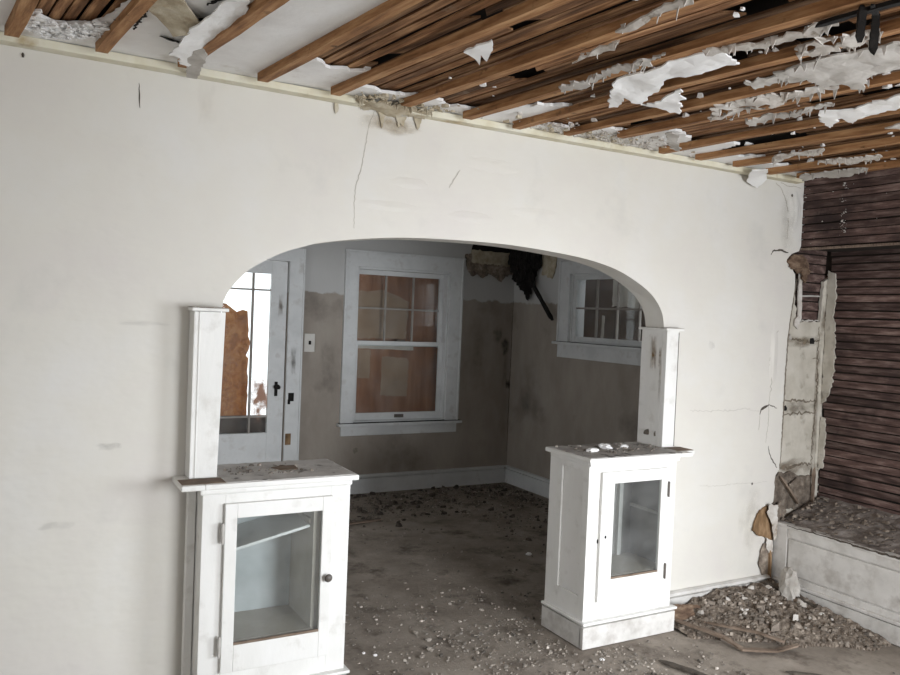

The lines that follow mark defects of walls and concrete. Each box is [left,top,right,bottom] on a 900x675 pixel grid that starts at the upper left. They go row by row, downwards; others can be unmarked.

spalling [24,9,110,42]
flaking render [149,0,250,79]
flaking render [464,39,493,65]
flaking render [572,0,694,64]
flaking render [558,22,900,128]
spalling [503,112,667,151]
crack [354,113,374,223]
flaking render [747,148,883,188]
spalling [465,244,513,282]
spalling [541,254,557,279]
spalling [790,247,827,322]
spalling [758,468,900,580]